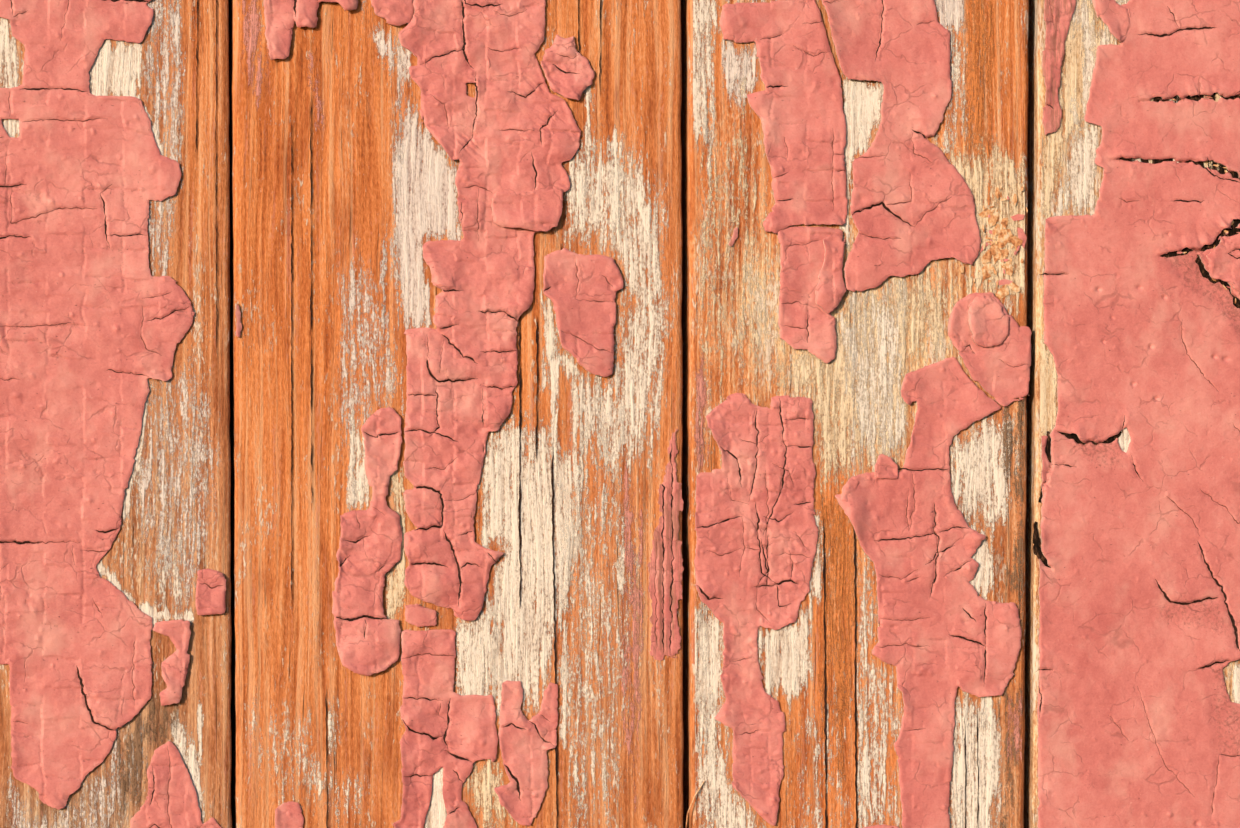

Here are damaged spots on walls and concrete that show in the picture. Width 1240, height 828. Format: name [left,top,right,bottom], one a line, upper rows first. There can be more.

peeling [720,0,981,363]
crack [1116,157,1240,203]
crack [1140,9,1217,37]
crack [1153,88,1240,103]
crack [1160,219,1240,308]
peeling [0,0,226,810]
peeling [263,0,624,828]
peeling [647,393,819,826]
peeling [835,292,1058,828]
crack [1033,416,1143,568]
crack [1155,489,1240,669]
peeling [130,741,222,828]